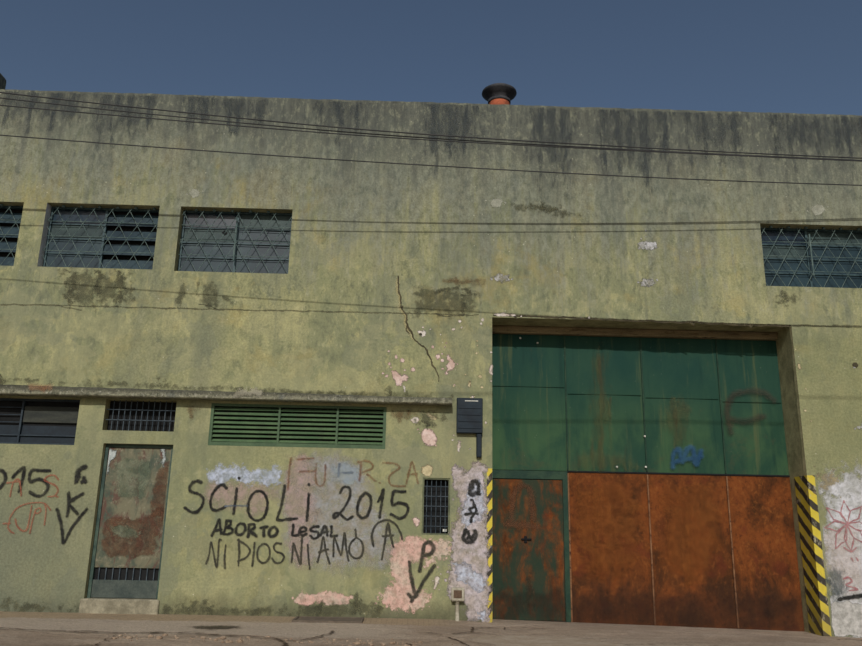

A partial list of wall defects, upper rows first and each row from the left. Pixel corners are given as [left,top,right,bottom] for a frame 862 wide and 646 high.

damp [64,269,135,304]
damp [414,287,473,315]
crack [1,276,478,382]
spalling [382,350,415,392]
spalling [417,326,458,375]
peeling [207,455,491,622]
peeling [819,465,862,638]